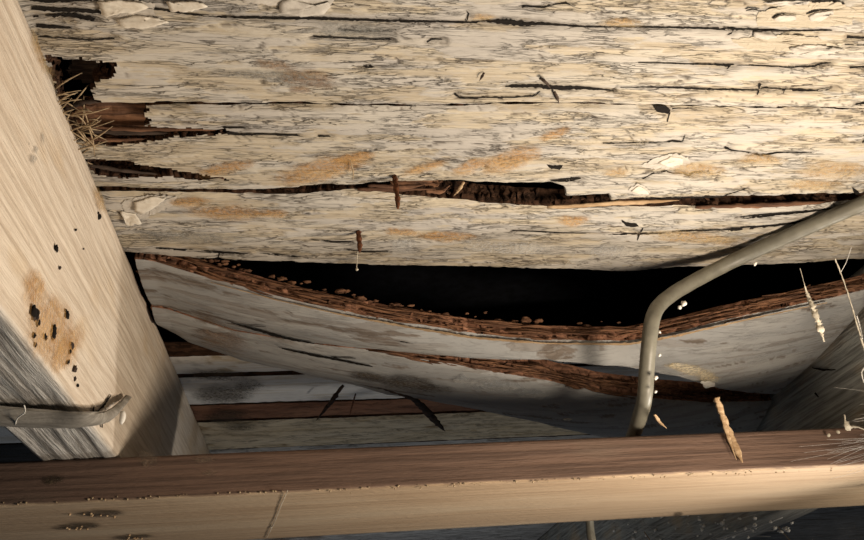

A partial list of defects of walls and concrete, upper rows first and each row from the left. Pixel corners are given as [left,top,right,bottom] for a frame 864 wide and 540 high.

peeling [97,0,208,29]
peeling [242,0,334,17]
crack [147,2,864,99]
crack [223,126,331,137]
crack [603,136,685,144]
crack [551,175,581,183]
crack [630,170,744,200]
peeling [120,195,177,226]